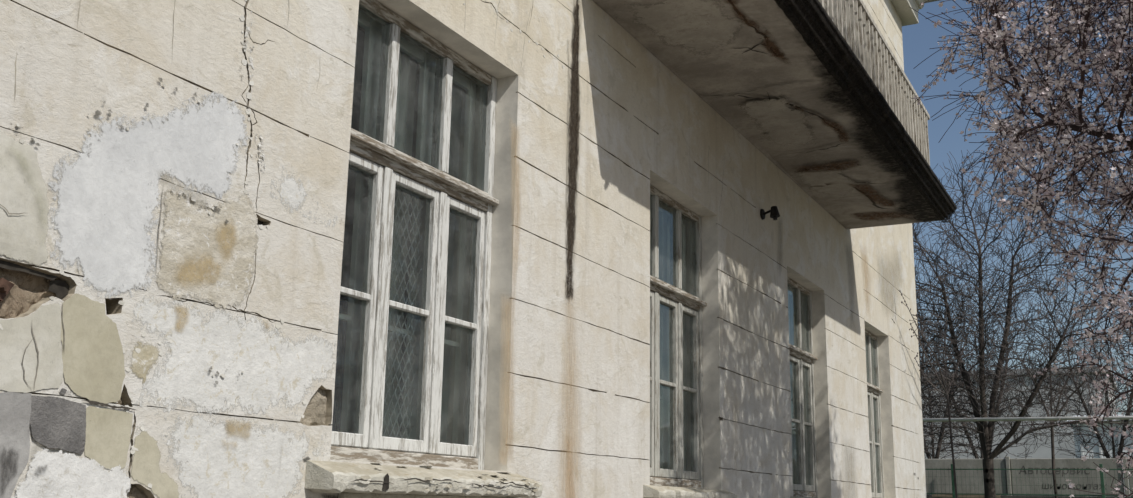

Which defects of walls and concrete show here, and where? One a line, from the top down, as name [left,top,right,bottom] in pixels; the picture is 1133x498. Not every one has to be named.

crack [239,0,264,202]
damp [566,0,580,299]
damp [776,0,957,223]
peeling [0,123,338,498]